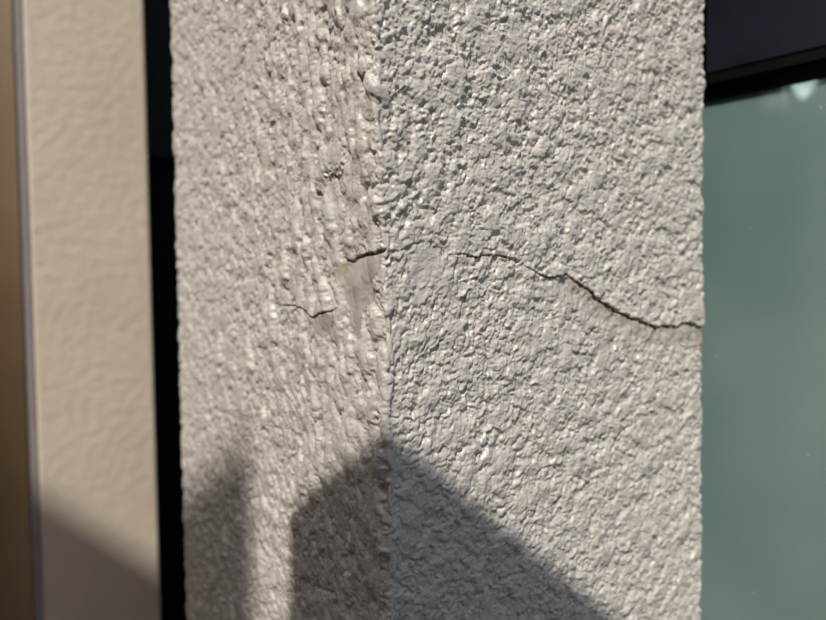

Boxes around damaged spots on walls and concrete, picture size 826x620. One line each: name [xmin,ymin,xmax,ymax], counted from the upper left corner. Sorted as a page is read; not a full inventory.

crack [345,249,386,261]
crack [279,304,337,318]
crack [407,241,702,372]